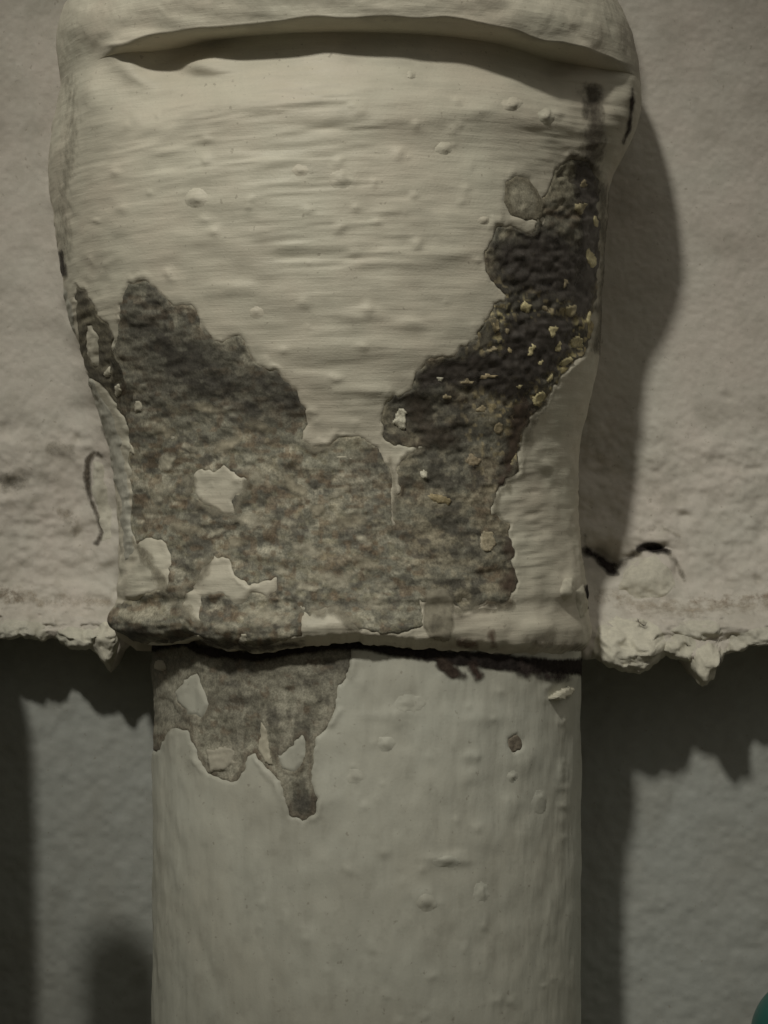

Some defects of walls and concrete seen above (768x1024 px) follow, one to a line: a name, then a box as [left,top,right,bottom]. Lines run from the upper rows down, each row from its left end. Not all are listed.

crack [623,89,635,144]
crack [84,432,105,545]
peeling [0,159,601,821]
crack [584,542,684,608]
crack [152,641,582,682]